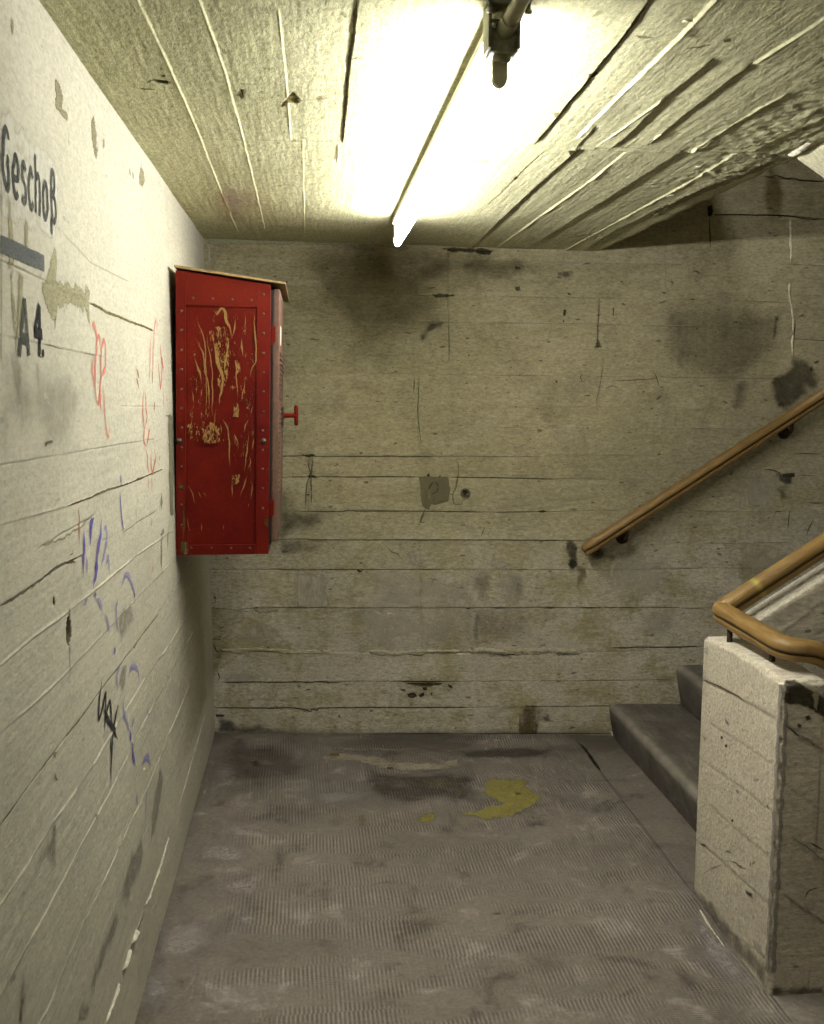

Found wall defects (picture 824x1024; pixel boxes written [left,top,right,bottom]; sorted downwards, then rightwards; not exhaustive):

peeling [55,80,68,120]
spalling [280,92,303,107]
peeling [91,117,105,158]
damp [444,247,492,255]
damp [773,283,819,407]
crack [1,469,163,606]
damp [567,542,585,582]